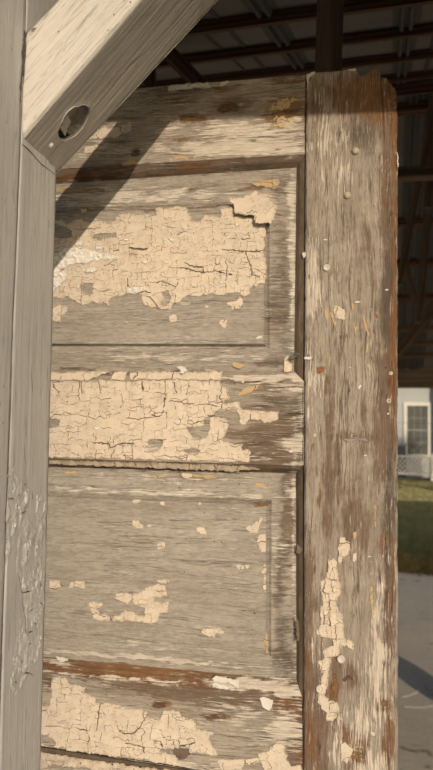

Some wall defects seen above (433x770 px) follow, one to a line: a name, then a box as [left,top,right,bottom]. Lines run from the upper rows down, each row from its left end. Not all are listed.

crack [244,81,306,137]
peeling [52,179,278,323]
peeling [49,371,278,479]
peeling [87,579,176,624]
peeling [316,532,357,721]
crack [41,746,195,770]
peeling [40,676,302,770]